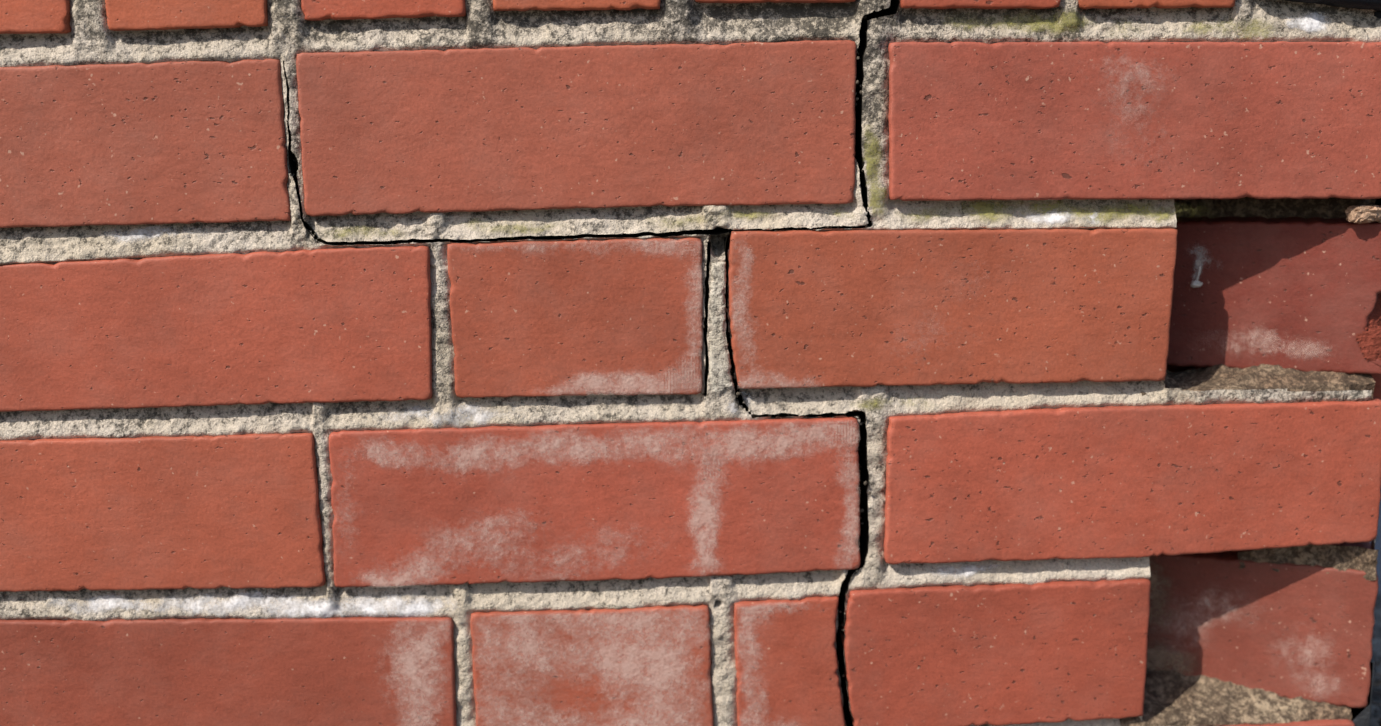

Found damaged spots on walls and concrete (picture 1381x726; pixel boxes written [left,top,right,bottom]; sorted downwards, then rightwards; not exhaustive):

crack [283,0,900,726]
spalling [1356,293,1381,361]
damp [703,425,856,457]
damp [692,474,715,565]
damp [556,613,684,726]